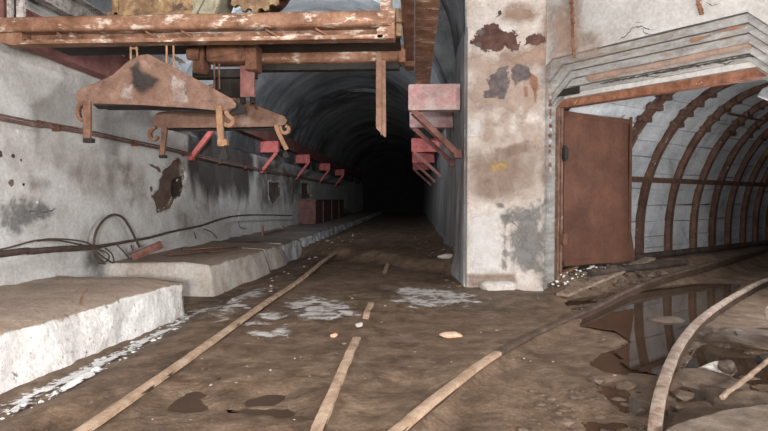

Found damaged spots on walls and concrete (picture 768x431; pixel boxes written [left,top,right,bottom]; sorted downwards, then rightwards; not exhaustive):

peeling [470,23,546,55]
rust [569,0,578,58]
peeling [484,64,532,99]
flaking render [148,156,186,214]
damp [181,131,299,216]
damp [390,8,598,308]